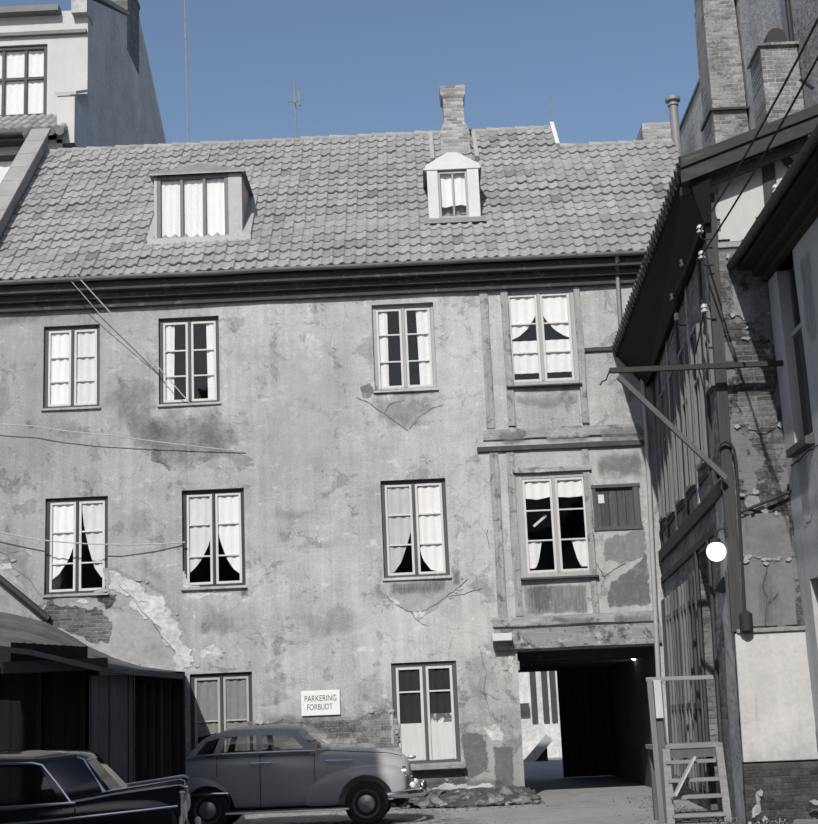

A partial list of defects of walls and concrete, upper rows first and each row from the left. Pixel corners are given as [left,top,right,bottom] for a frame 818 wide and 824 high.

flaking render [730,263,783,434]
crack [357,397,442,431]
flaking render [740,488,779,516]
flaking render [0,558,26,590]
flaking render [38,568,225,671]
crack [386,578,482,626]
leakage [604,529,651,621]
crack [762,565,779,627]
leakage [411,733,514,789]